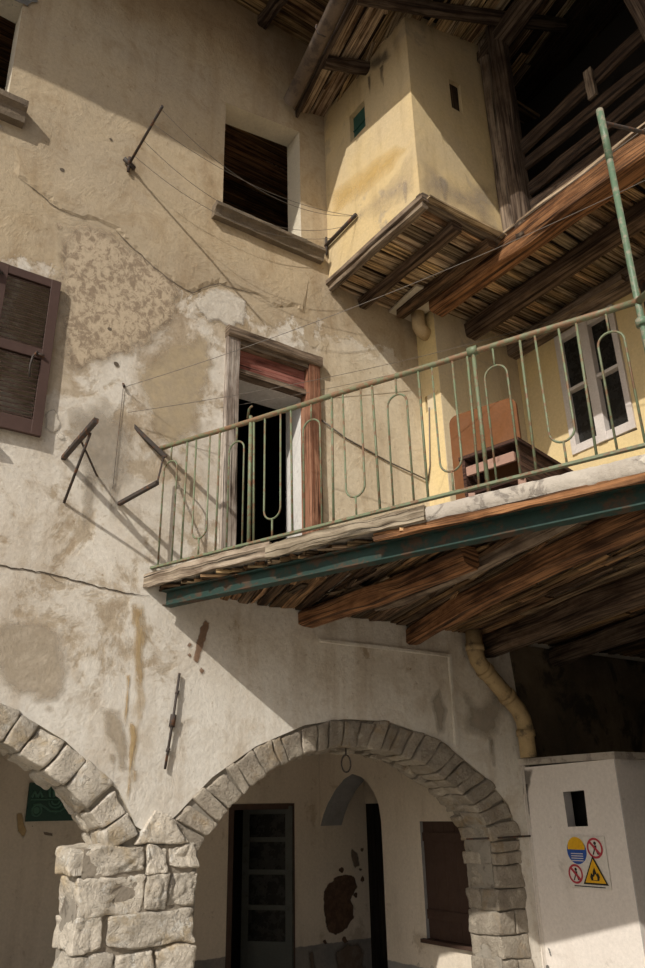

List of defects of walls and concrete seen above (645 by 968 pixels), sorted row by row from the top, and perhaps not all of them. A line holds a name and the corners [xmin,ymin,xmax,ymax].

flaking render [61,226,179,368]
crack [120,235,259,295]
flaking render [195,288,246,326]
flaking render [141,337,212,442]
crack [0,564,148,596]
flaking render [323,848,364,944]